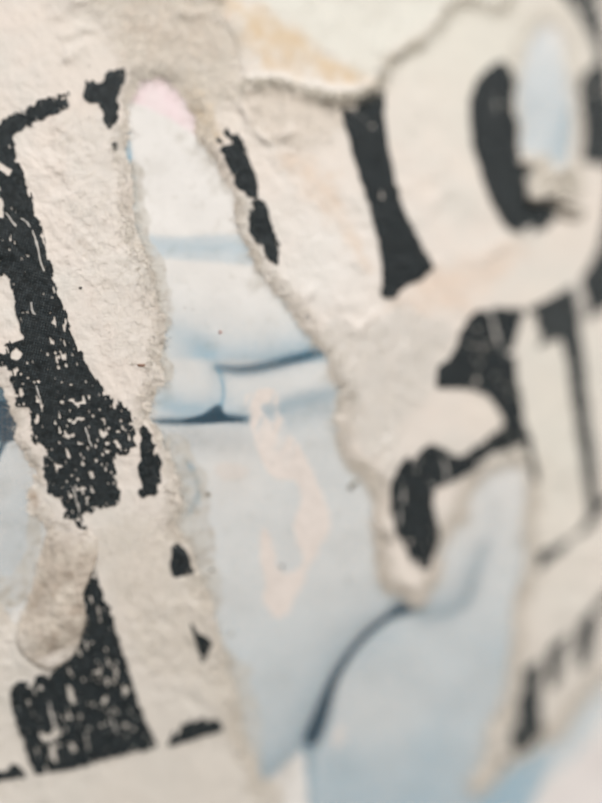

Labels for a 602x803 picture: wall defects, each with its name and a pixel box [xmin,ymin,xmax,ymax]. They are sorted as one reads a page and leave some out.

peeling [79,0,352,156]
peeling [255,0,441,78]
peeling [244,387,310,465]
peeling [15,503,248,747]